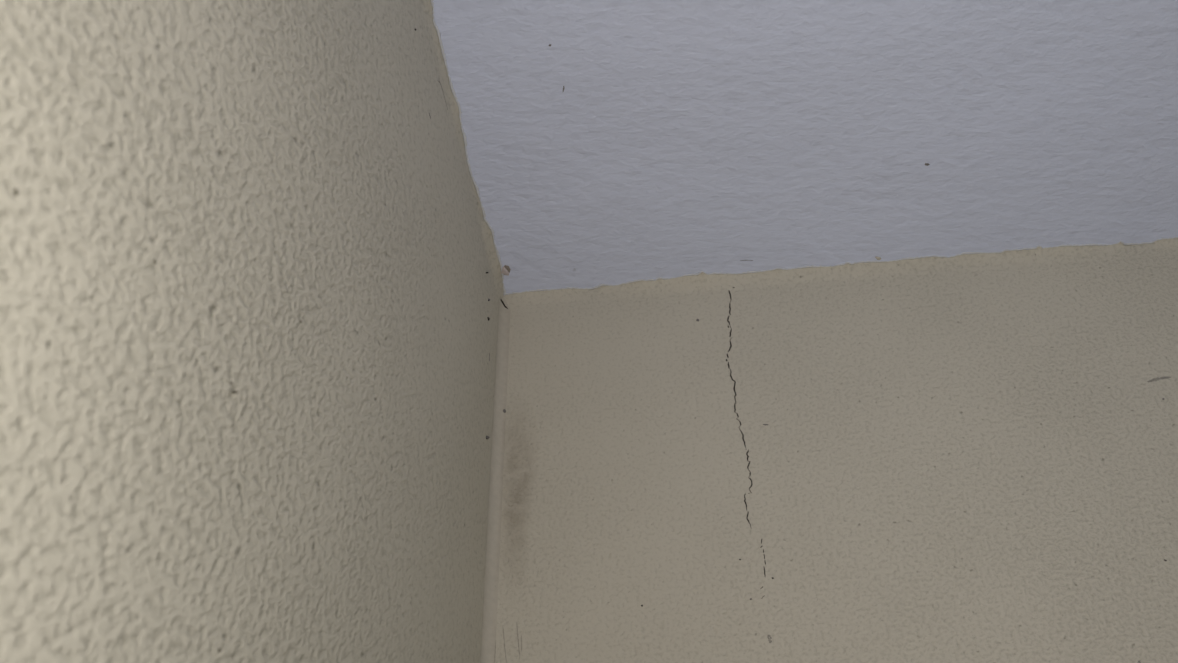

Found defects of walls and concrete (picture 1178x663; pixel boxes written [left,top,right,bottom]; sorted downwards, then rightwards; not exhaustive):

crack [726,291,766,598]